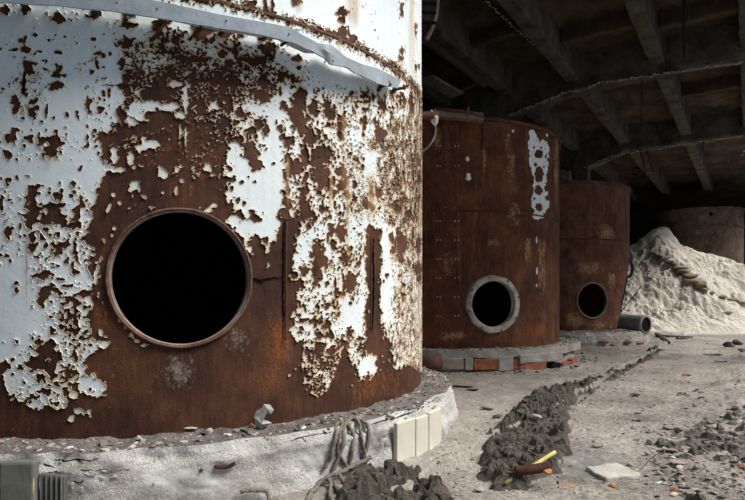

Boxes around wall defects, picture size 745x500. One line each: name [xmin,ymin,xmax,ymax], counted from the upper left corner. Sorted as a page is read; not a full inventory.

rust [327,7,355,46]
rust [286,103,313,137]
rust [240,139,263,171]
rust [283,153,351,199]
peeling [528,129,549,220]
peeling [0,0,422,422]
crack [252,221,286,340]
rust [299,245,332,284]
rust [327,217,348,242]
rust [339,269,360,296]
crack [369,238,377,333]
rust [389,228,414,262]